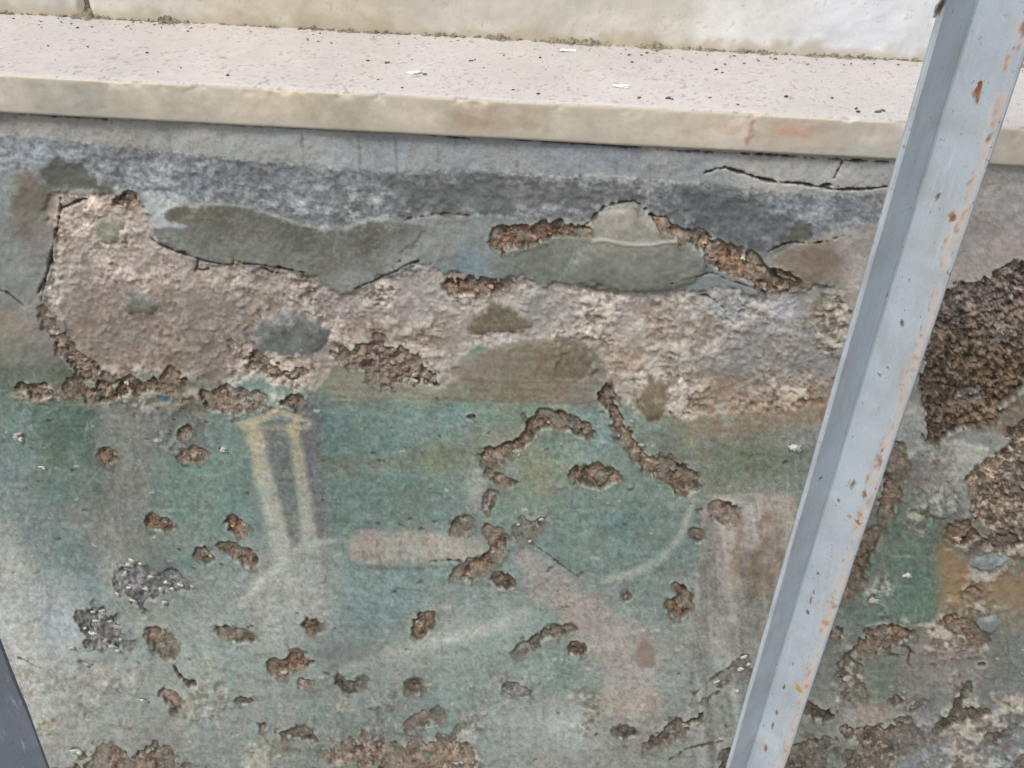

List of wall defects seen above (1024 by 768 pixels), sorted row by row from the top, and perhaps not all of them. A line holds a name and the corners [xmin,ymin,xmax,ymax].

crack [19,113,145,121]
crack [428,133,470,141]
crack [514,139,890,192]
spalling [11,187,851,593]
spalling [917,257,1024,670]
peeling [68,558,198,717]
spalling [509,620,593,662]
spalling [256,676,484,768]
spalling [785,618,1014,768]